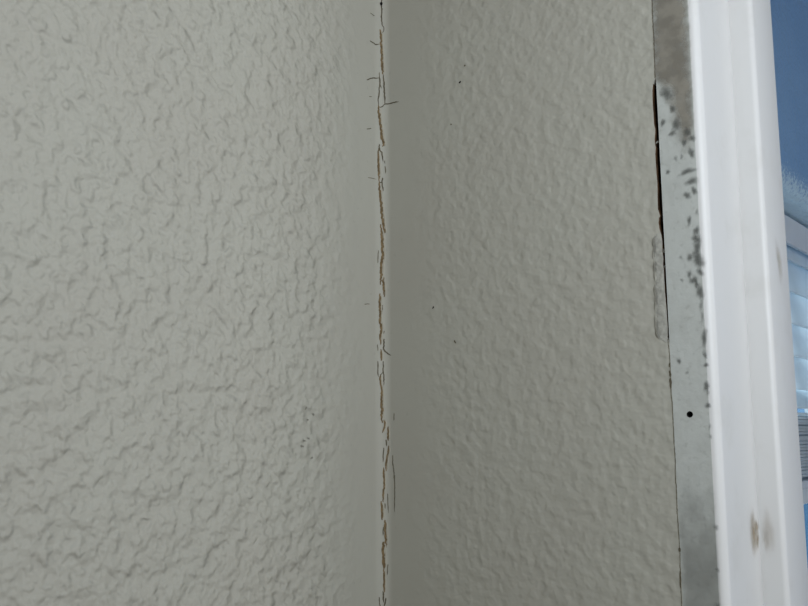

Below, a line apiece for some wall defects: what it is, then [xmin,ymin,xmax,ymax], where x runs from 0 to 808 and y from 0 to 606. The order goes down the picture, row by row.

crack [365,0,399,606]
mould [688,218,702,296]